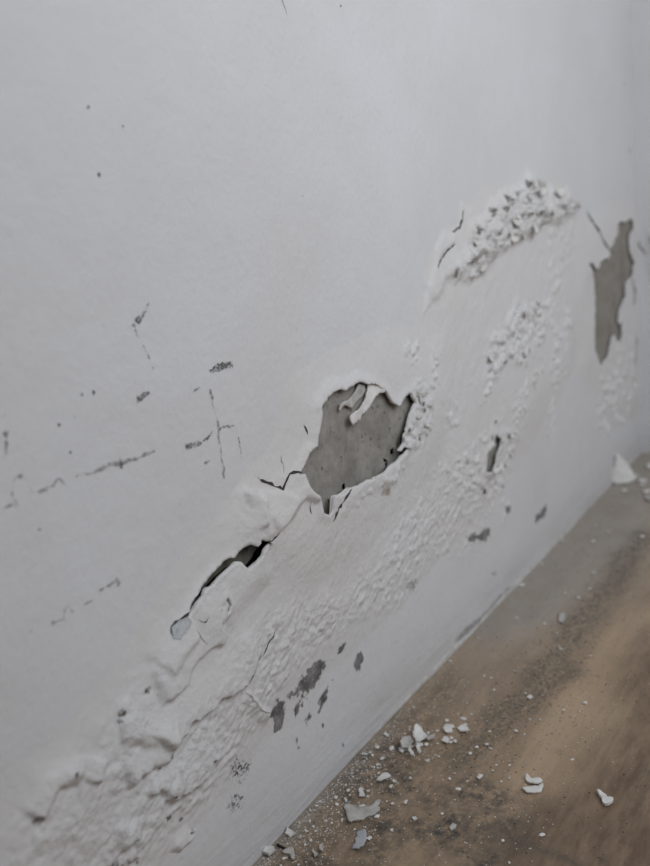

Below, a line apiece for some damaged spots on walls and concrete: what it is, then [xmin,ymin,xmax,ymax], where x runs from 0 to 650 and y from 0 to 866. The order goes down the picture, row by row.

peeling [575,197,642,439]
crack [186,421,240,478]
crack [171,612,229,642]
peeling [110,316,470,866]